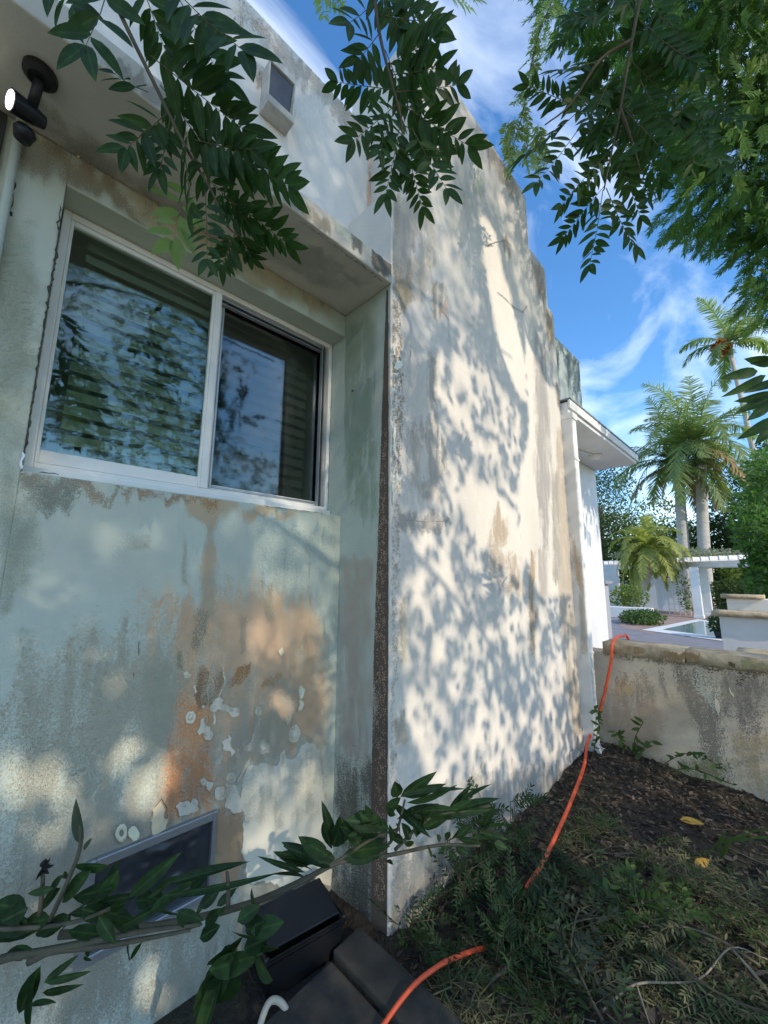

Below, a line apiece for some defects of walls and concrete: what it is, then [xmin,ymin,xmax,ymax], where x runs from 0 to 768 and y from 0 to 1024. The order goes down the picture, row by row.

water stain [176,194,416,935]
peeling [115,798,199,842]
peeling [185,686,333,890]
water stain [600,653,768,799]